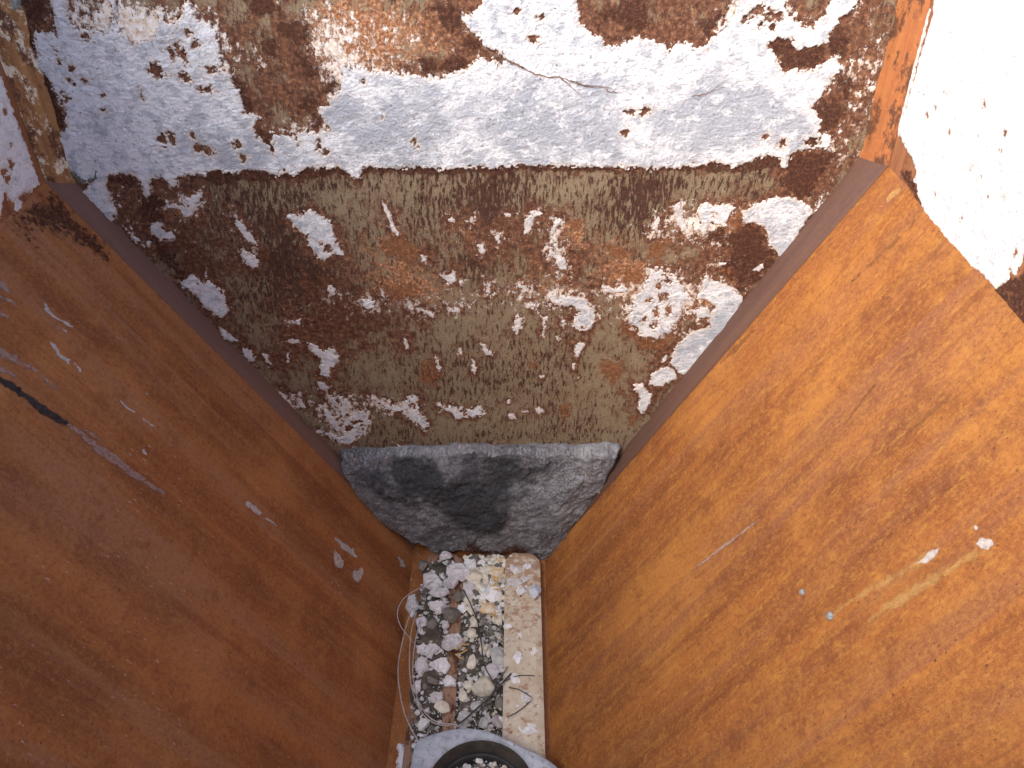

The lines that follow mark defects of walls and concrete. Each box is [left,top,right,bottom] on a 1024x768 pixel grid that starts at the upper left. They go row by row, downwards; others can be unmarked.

peeling [32,0,858,270]
rust [361,72,855,199]
rust [189,167,347,203]
rust [900,170,921,204]
peeling [177,270,272,365]
peeling [512,285,596,379]
peeling [602,266,743,414]
rust [705,208,777,293]
rust [995,270,1024,323]
peeling [281,339,372,444]
peeling [370,394,430,432]
water stain [364,451,546,536]